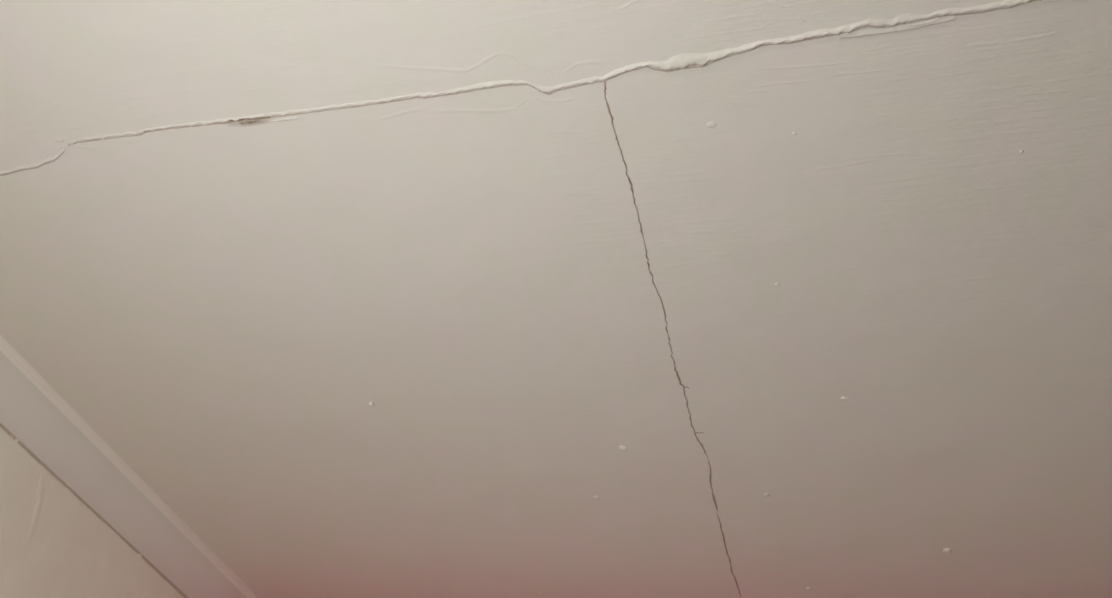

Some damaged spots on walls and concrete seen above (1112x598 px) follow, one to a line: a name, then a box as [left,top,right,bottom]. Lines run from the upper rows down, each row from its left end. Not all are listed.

crack [0,147,65,176]
crack [68,0,1038,150]
crack [604,81,744,598]
crack [0,423,188,598]